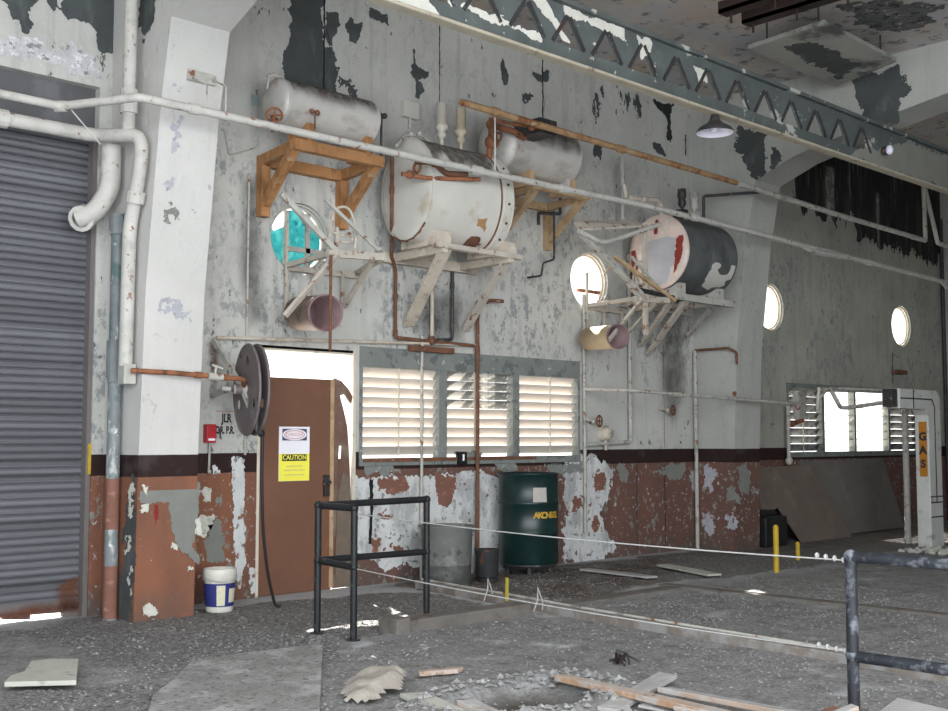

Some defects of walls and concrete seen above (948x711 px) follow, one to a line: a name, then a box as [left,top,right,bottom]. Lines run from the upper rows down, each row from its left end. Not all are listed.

peeling [2,0,114,54]
peeling [138,0,155,94]
peeling [282,0,389,97]
peeling [410,49,429,99]
peeling [852,64,912,125]
spalling [836,0,945,32]
peeling [734,125,782,180]
peeling [792,157,940,267]
peeling [118,456,255,621]
flaking render [351,455,518,574]
flaking render [544,453,629,563]
rust [0,579,78,619]